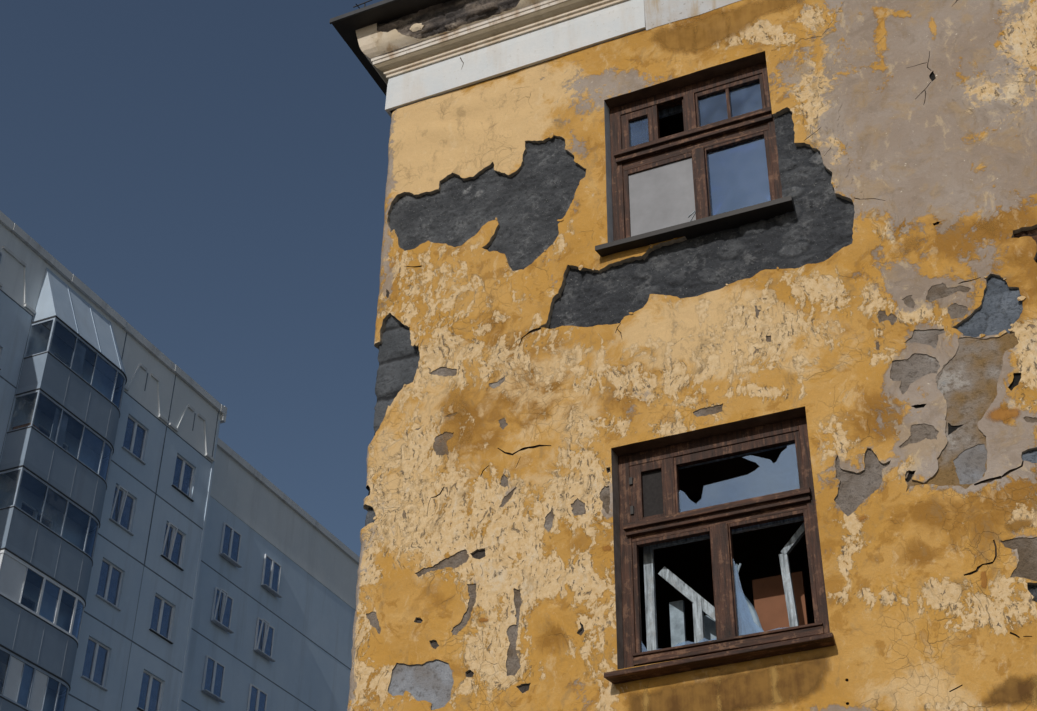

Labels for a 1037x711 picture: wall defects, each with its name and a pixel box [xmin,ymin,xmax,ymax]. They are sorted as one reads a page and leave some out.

spalling [377,0,520,40]
peeling [540,0,1037,329]
spalling [387,133,586,271]
spalling [374,313,457,436]
peeling [890,273,1026,492]
crack [480,445,551,477]
peeling [834,448,891,516]
spalling [1021,447,1037,463]
crack [964,540,997,576]
peeling [1000,537,1037,602]
peeling [388,640,474,710]